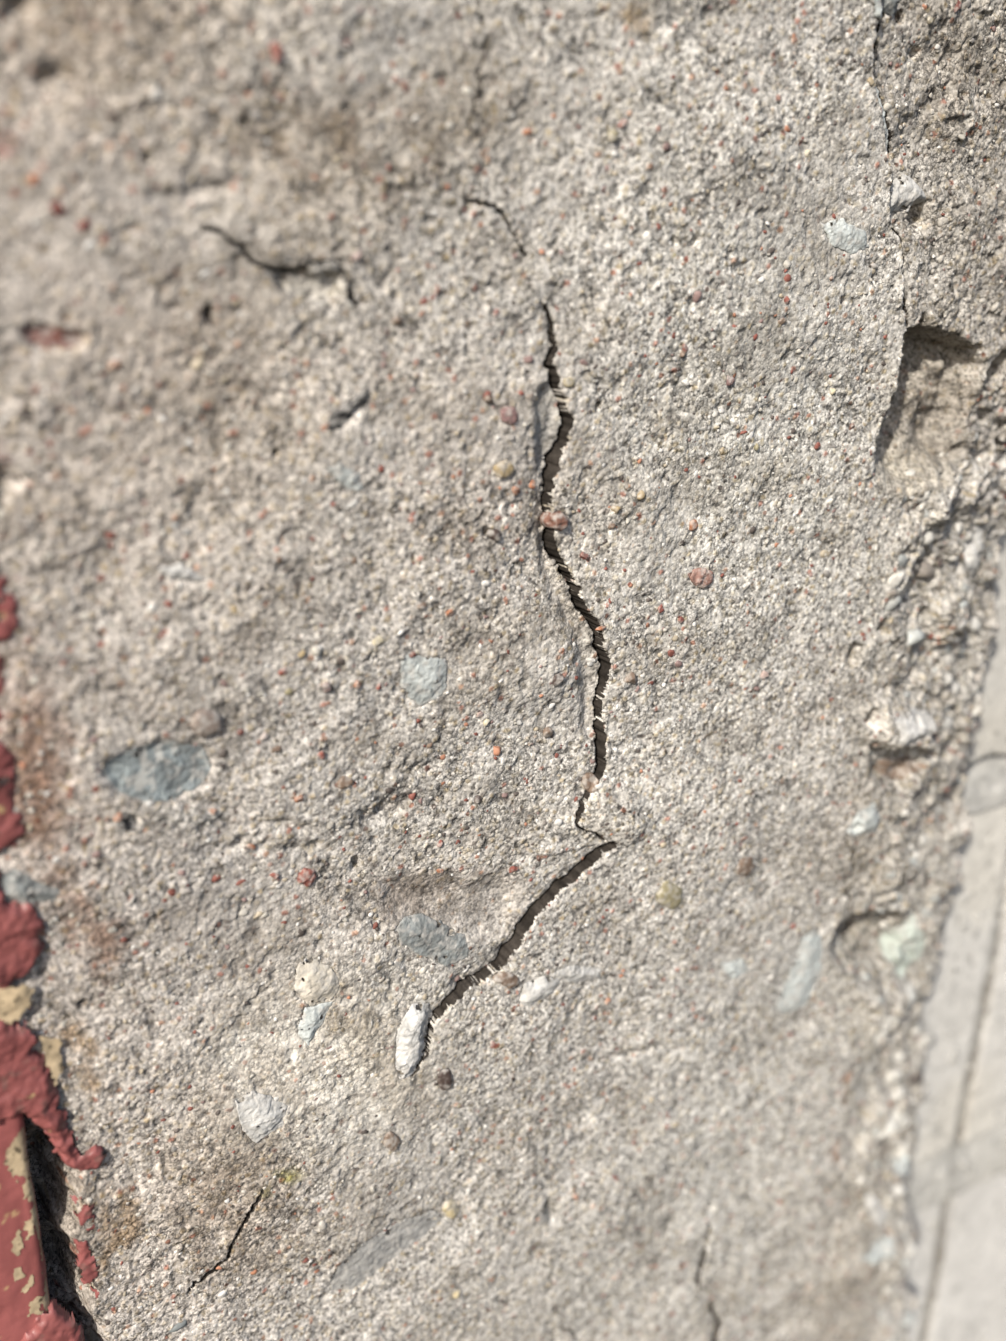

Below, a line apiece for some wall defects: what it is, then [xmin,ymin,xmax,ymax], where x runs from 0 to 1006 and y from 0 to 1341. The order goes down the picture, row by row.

crack [873,13,893,193]
crack [196,226,358,307]
crack [464,199,527,257]
crack [891,228,909,326]
crack [412,305,617,1076]
spalling [826,315,1006,1310]
peeling [0,984,35,1025]
peeling [39,1035,64,1086]
peeling [4,1127,50,1317]
peeling [69,1195,101,1298]
crack [189,1189,264,1294]